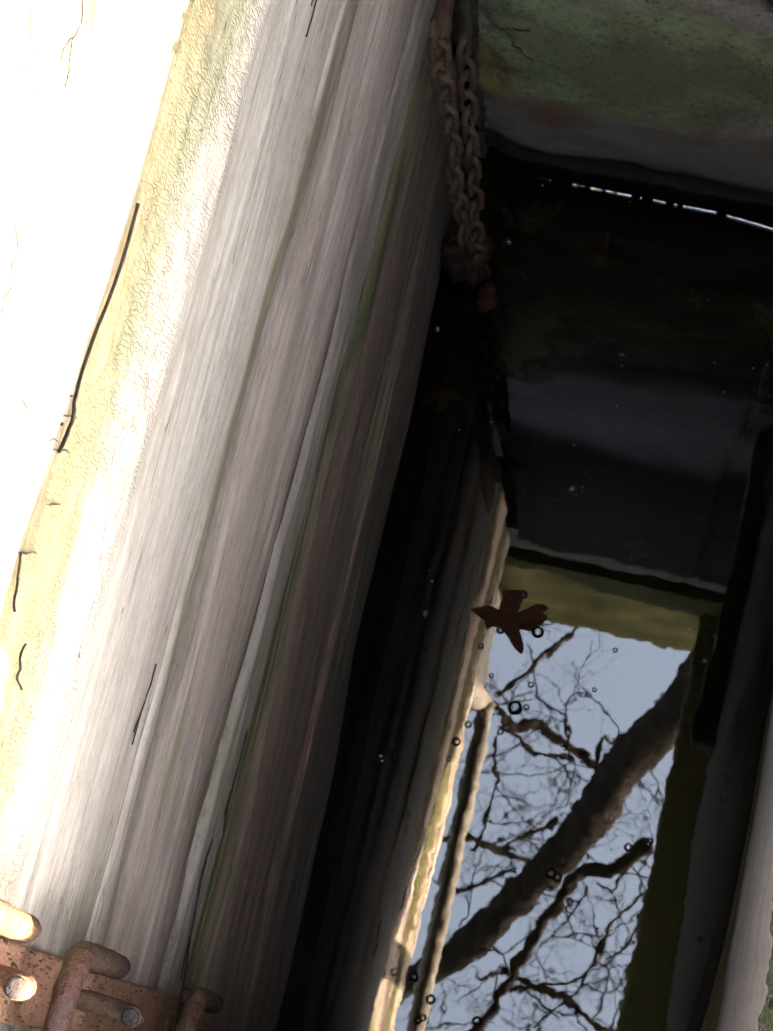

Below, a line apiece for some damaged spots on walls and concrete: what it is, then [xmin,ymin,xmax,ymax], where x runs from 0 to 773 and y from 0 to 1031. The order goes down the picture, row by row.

crack [60,0,84,88]
crack [306,0,317,37]
leakage [569,0,773,45]
crack [0,225,20,315]
crack [57,203,140,453]
crack [13,552,22,612]